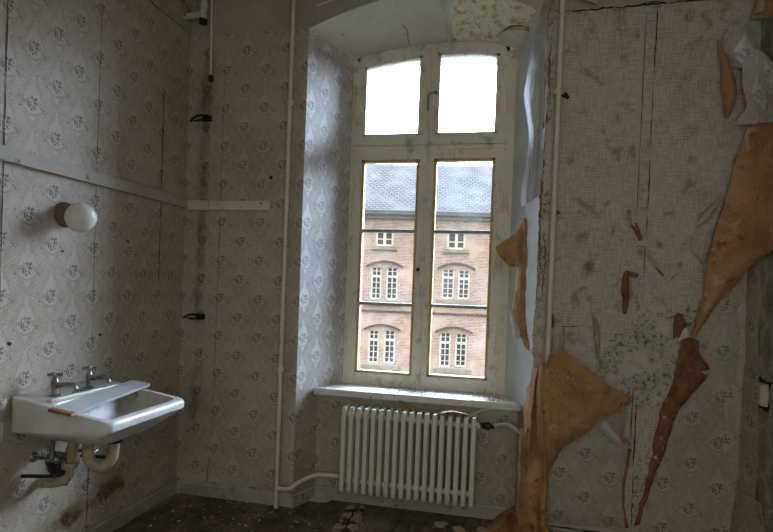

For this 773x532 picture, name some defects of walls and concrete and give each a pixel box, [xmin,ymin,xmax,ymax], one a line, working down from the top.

spalling [440,0,570,358]
leakage [597,276,704,409]